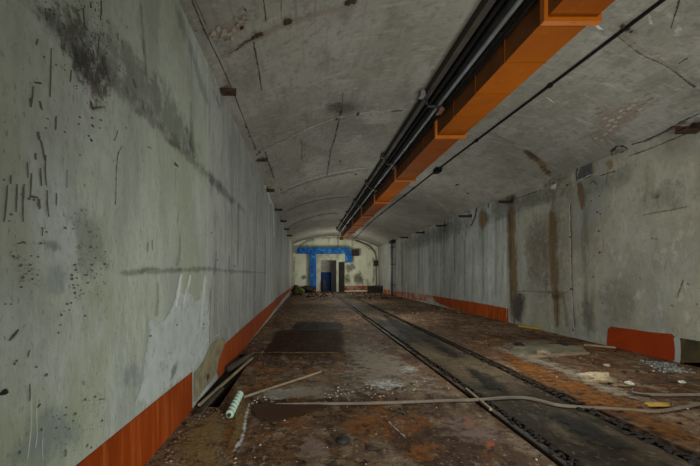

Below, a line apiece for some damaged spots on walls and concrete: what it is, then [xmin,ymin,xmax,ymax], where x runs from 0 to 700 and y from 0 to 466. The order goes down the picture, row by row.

leakage [45,1,137,110]
crack [619,37,697,88]
crack [327,98,343,175]
spalling [576,163,597,185]
corrosion [506,196,519,315]
corrosion [532,211,568,327]
spalling [194,334,225,402]